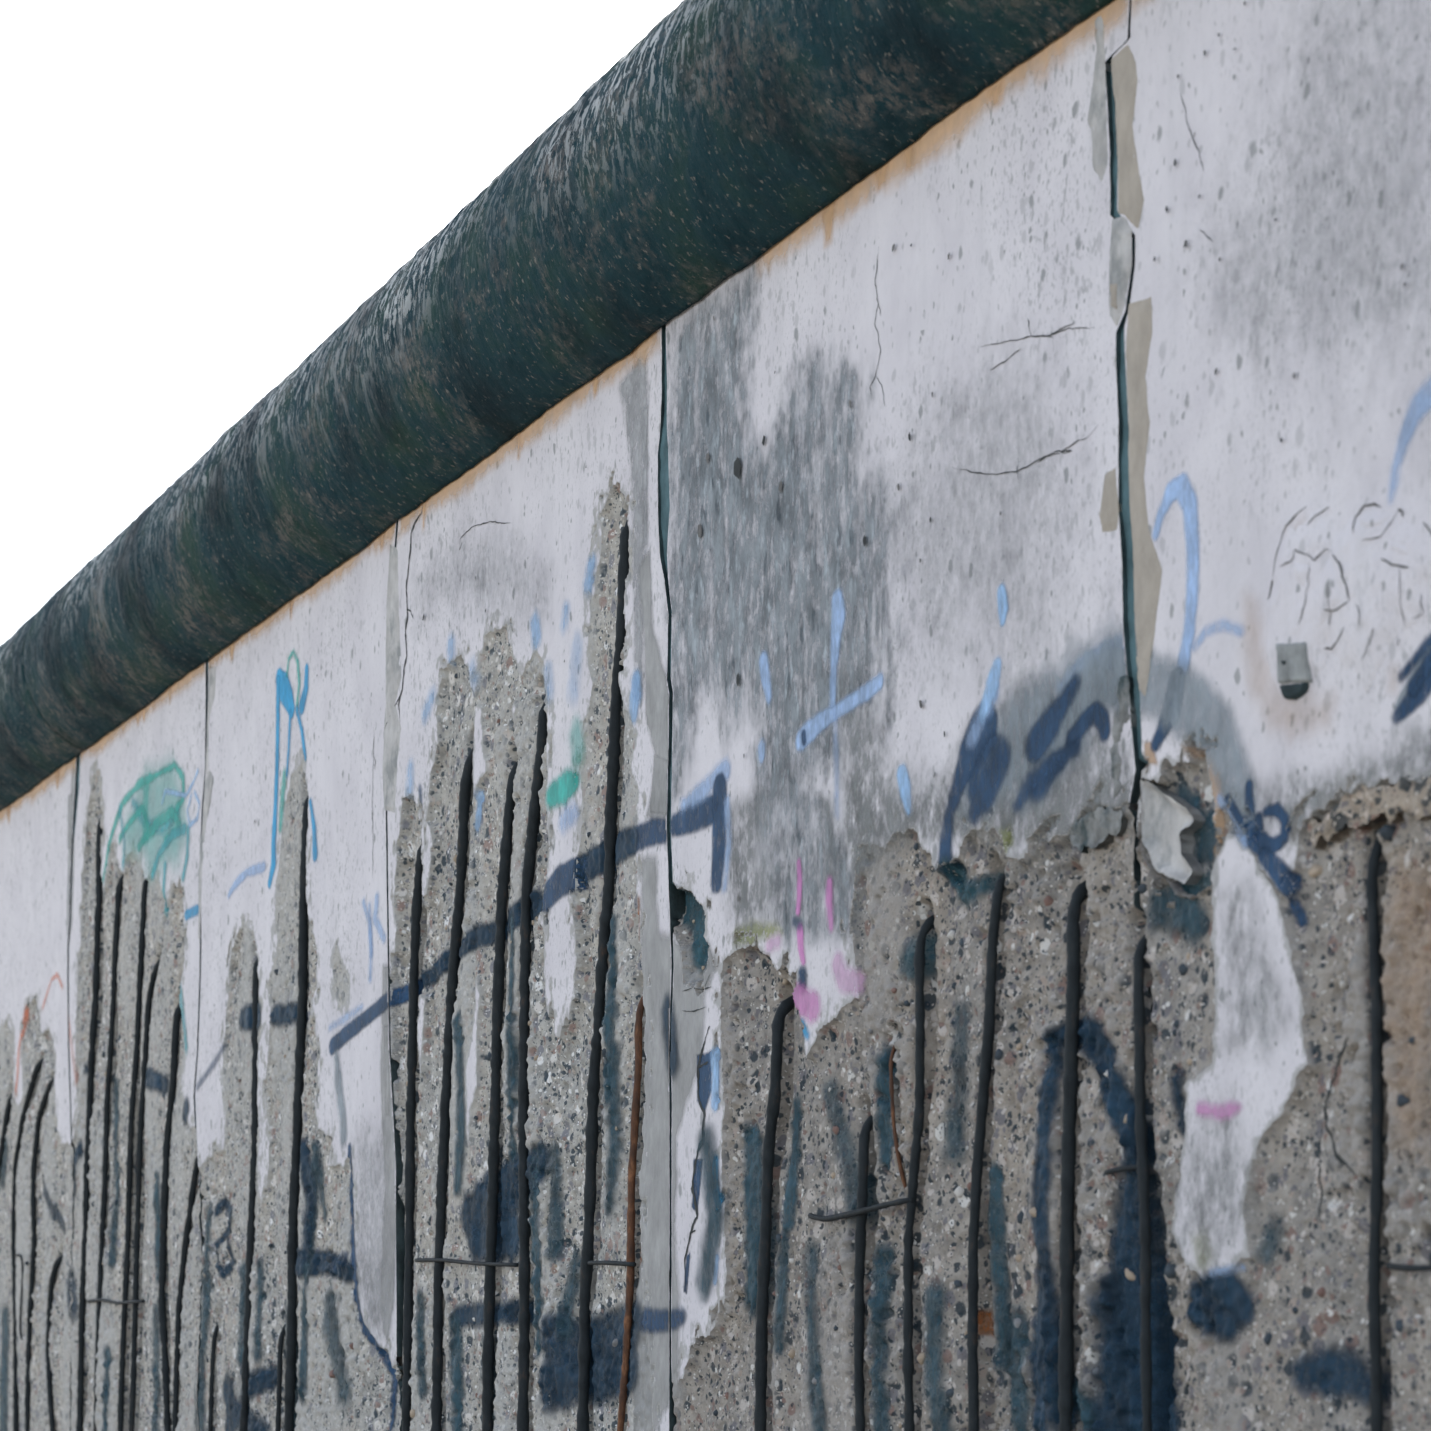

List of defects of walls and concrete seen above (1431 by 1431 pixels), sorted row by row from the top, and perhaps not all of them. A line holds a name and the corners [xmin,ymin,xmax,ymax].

crack [981,320,1094,370]
crack [954,425,1098,475]
spalling [0,471,1431,1431]